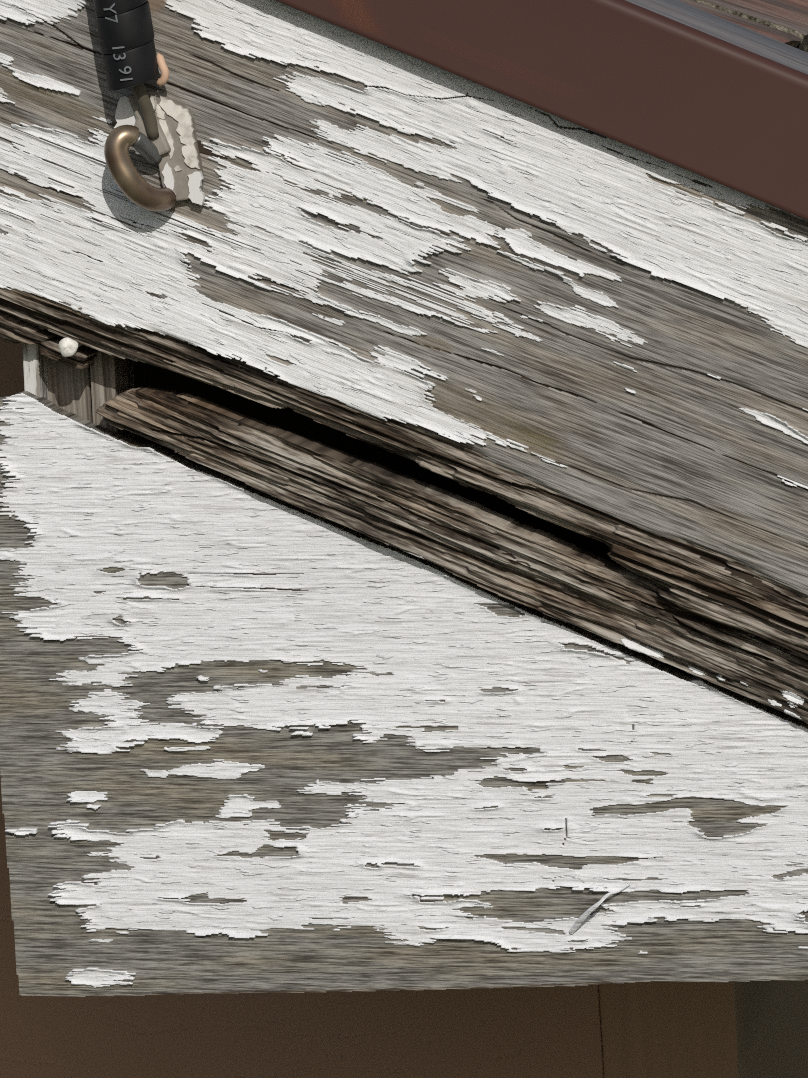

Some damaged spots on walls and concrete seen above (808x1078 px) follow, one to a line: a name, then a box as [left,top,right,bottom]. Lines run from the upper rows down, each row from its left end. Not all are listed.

crack [252,277,319,298]
peeling [0,0,808,600]
crack [152,429,319,483]
crack [383,331,808,490]
crack [494,304,808,412]
crack [187,573,308,591]
crack [377,496,530,567]
peeling [0,399,808,997]